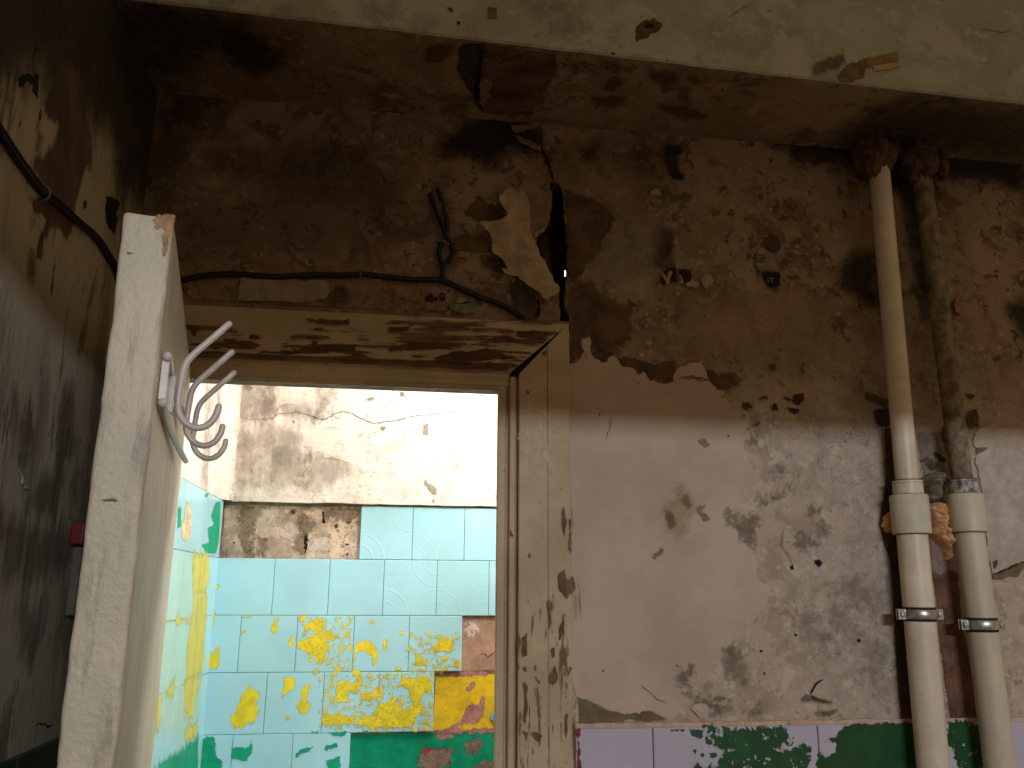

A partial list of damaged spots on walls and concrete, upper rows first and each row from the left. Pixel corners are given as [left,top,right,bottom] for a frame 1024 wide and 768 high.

damp [0,0,158,211]
spalling [457,44,557,152]
damp [442,119,540,164]
crack [243,404,472,463]
peeling [186,183,805,768]
mould [727,508,759,543]
damp [676,665,732,717]
damp [802,696,837,716]